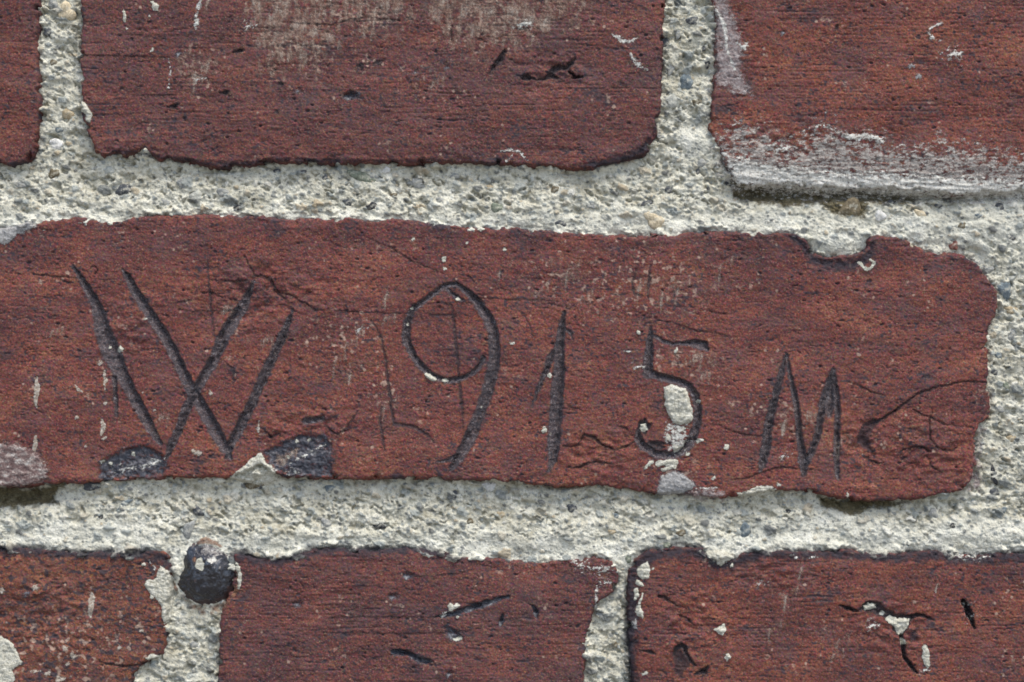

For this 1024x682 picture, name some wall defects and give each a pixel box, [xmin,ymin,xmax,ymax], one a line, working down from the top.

damp [709,120,1024,219]
spalling [638,418,665,450]
crack [868,381,987,468]
spalling [839,601,933,674]